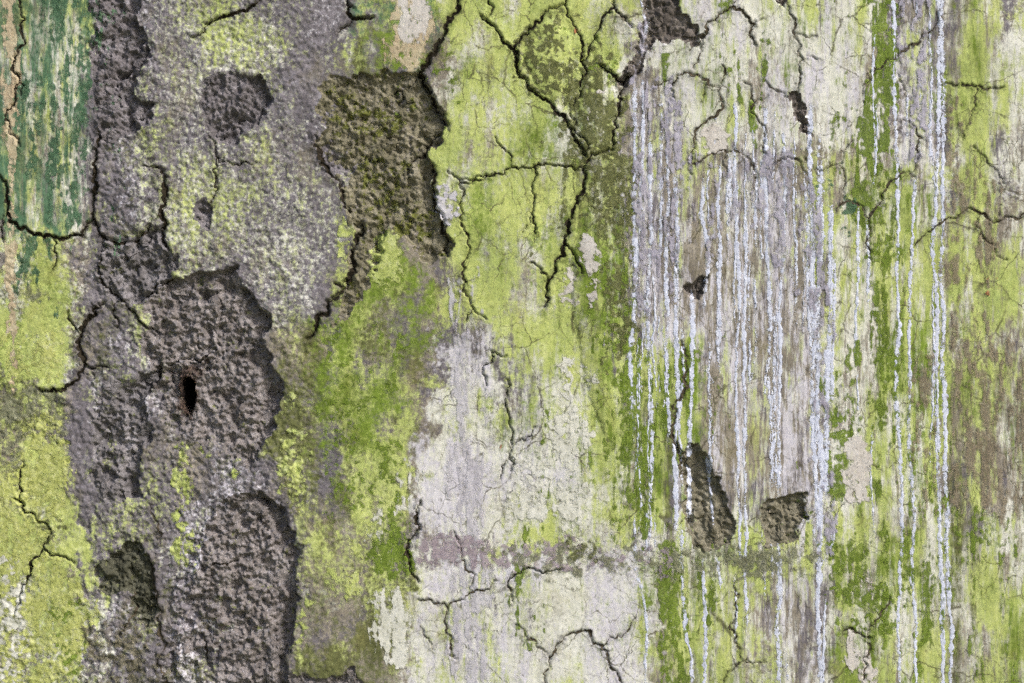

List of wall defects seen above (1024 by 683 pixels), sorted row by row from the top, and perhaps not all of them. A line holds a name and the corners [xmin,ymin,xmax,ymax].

crack [1,130,178,393]
spalling [87,217,284,502]
spalling [199,68,274,146]
crack [309,137,365,339]
spalling [315,68,460,328]
spalling [615,0,706,88]
crack [395,0,939,320]
leakage [416,0,1024,683]
spalling [94,490,364,683]
crack [404,507,554,659]
crack [522,618,635,683]
spalling [675,440,736,552]